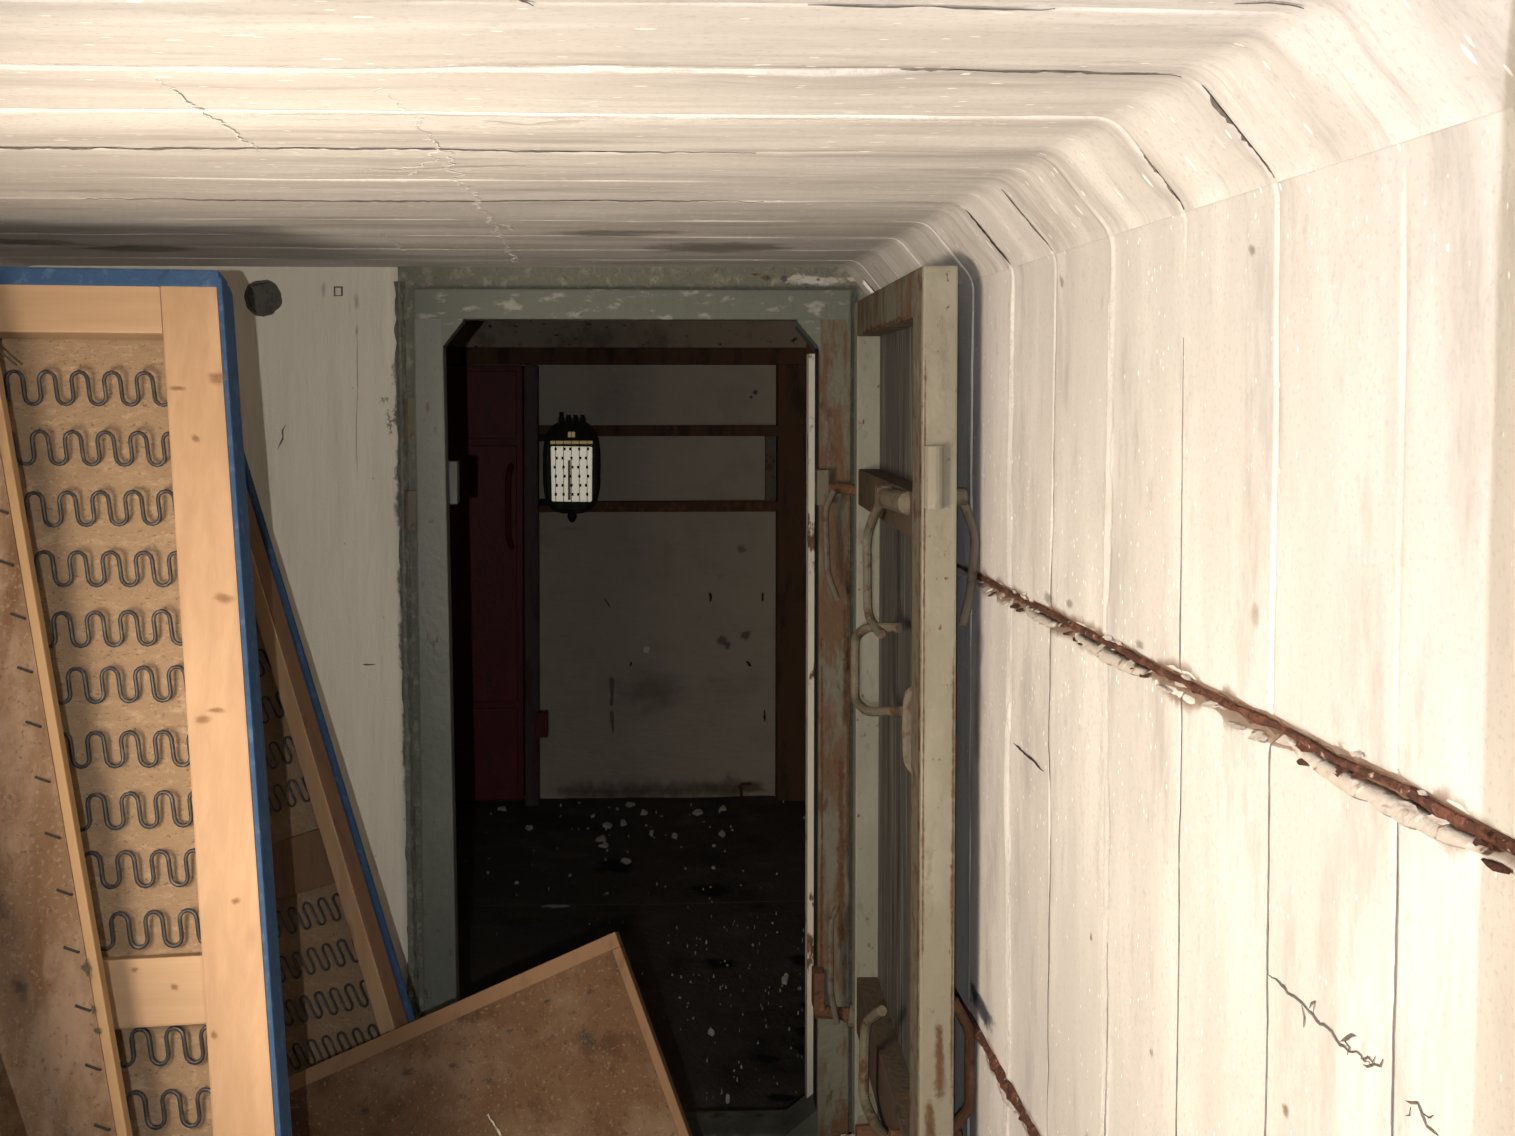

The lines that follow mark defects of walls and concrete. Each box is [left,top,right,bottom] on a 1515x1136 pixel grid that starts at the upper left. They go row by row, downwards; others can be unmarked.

crack [0,80,764,262]
spalling [954,335,1515,1136]
crack [1264,704,1438,1136]